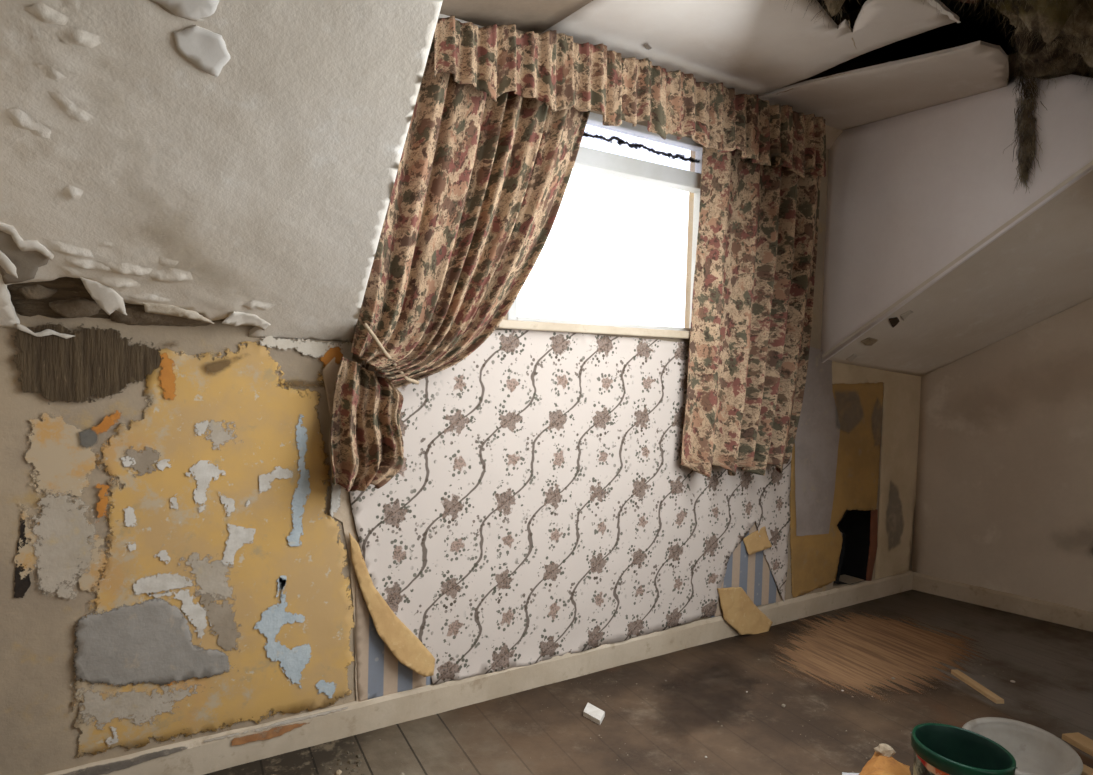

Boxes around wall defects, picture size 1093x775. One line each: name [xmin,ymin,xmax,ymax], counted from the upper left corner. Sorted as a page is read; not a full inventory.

peeling [149,0,230,77]
spalling [889,310,913,327]
peeling [0,222,355,758]
peeling [790,347,884,598]